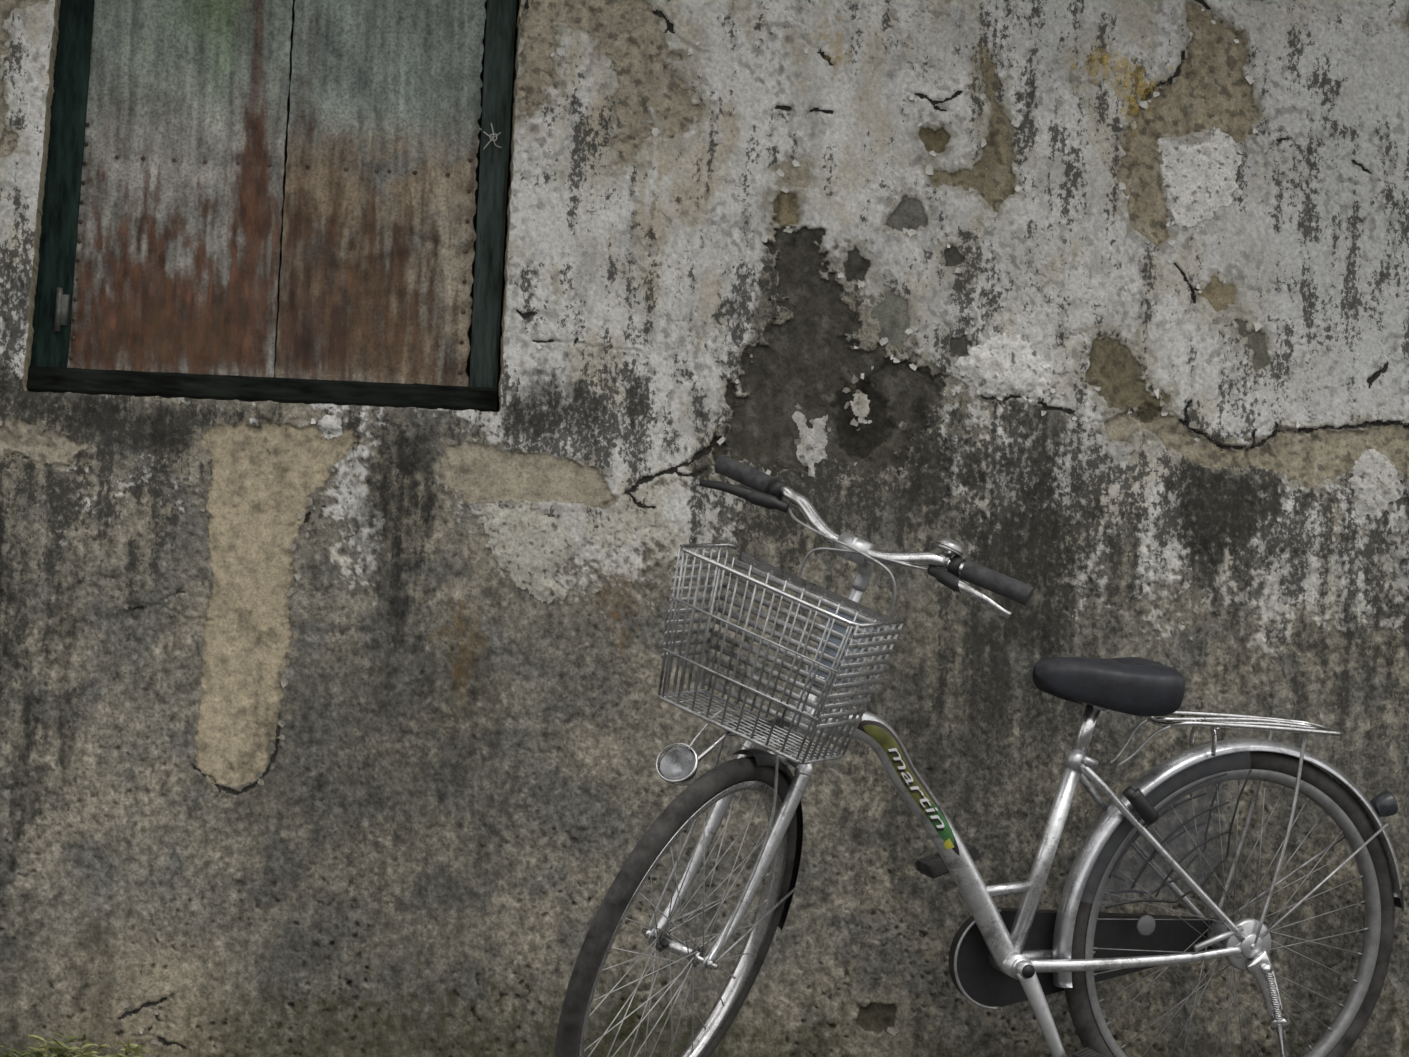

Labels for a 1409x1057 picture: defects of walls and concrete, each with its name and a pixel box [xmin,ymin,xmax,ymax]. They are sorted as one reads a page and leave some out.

peeling [1117,2,1260,246]
damp [0,628,41,866]
damp [46,581,76,785]
crack [124,590,185,616]
rust [71,110,311,374]
peeling [195,419,364,787]
damp [354,421,432,649]
crack [624,435,722,509]
spalling [712,160,948,478]
crack [981,392,1078,420]
peeling [1084,333,1409,488]
crack [1178,400,1409,452]